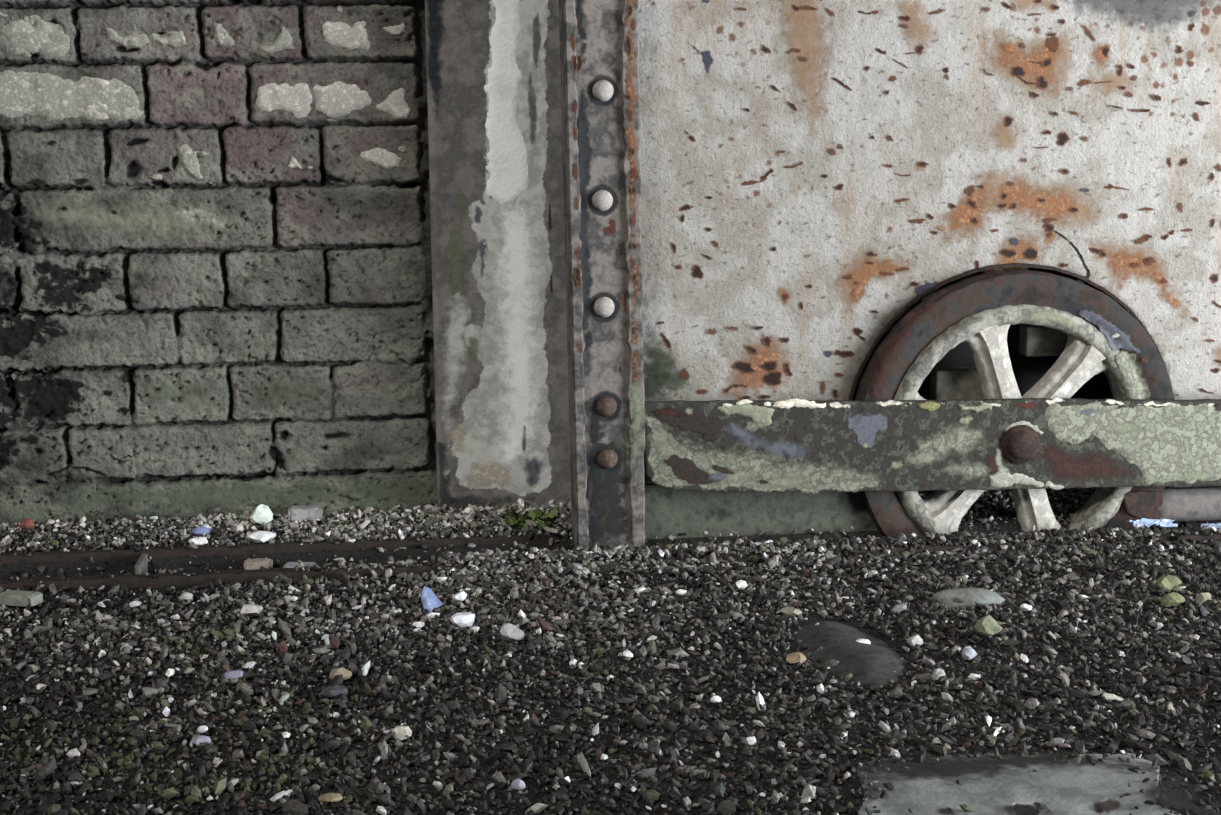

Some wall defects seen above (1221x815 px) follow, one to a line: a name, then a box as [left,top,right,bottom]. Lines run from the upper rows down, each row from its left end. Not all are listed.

damp [426,0,445,103]
corrosion [982,0,1161,112]
corrosion [1022,130,1088,163]
corrosion [909,168,1089,278]
damp [0,165,113,470]
damp [122,366,135,383]
corrosion [724,326,793,400]
corrosion [1089,228,1199,322]
damp [436,442,512,509]
peeling [646,399,911,494]
peeling [989,449,1064,490]
peeling [1005,398,1221,485]